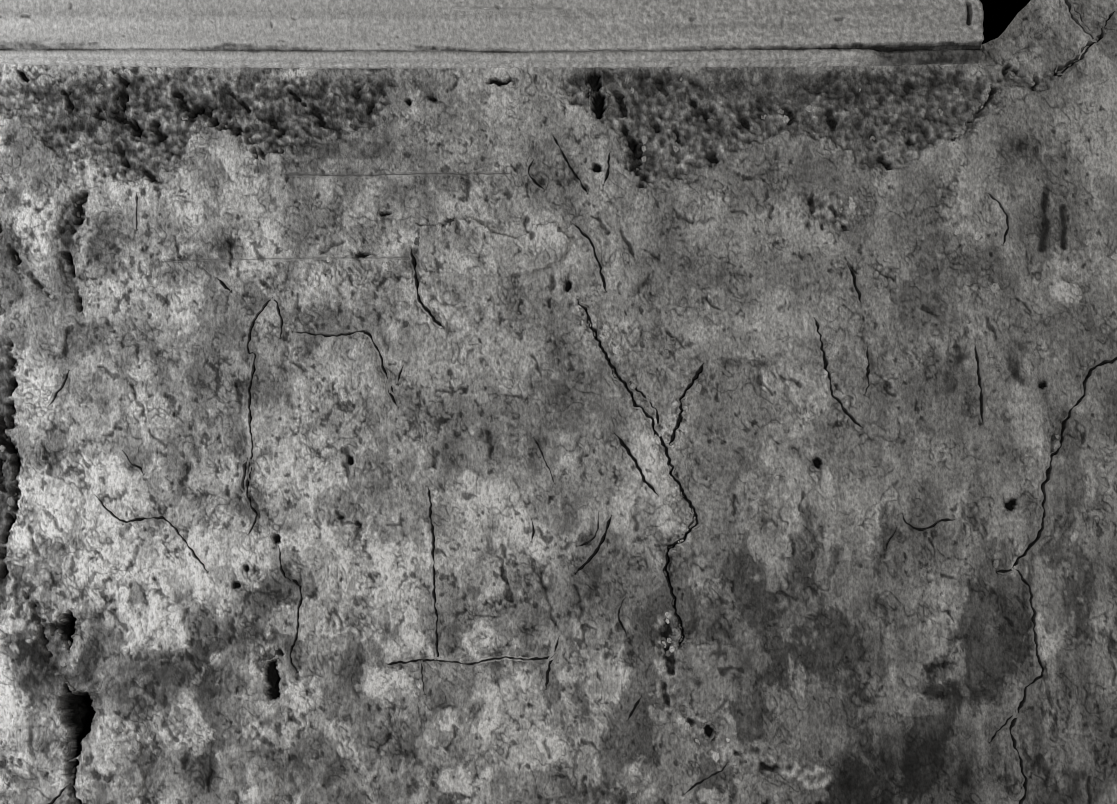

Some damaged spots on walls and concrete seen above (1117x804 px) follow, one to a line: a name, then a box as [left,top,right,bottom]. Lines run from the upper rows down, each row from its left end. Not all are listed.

crack [1055,0,1117,76]
spalling [555,58,1061,199]
spalling [0,65,441,319]
crack [986,191,1011,245]
crack [972,344,986,423]
spalling [0,329,149,804]
crack [988,355,1117,804]
crack [626,696,643,722]
crack [684,761,729,796]